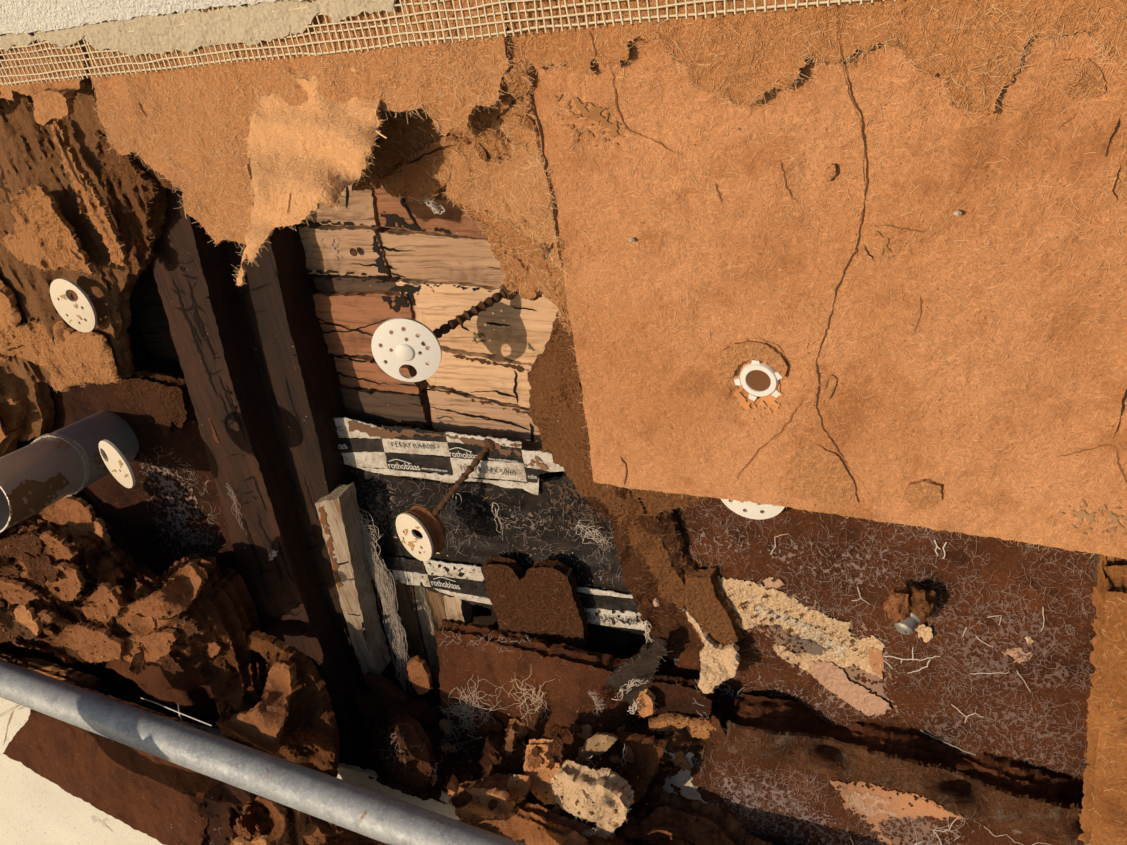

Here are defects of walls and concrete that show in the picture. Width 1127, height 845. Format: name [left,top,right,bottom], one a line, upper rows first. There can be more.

peeling [0,0,1127,287]
crack [1105,116,1121,198]
crack [734,5,923,495]
spalling [116,369,195,437]
crack [1057,388,1127,485]
mould [471,503,578,532]
spalling [525,311,744,664]
mould [689,517,901,591]
water stain [743,675,840,724]
mould [892,595,1086,780]
mould [711,767,860,845]